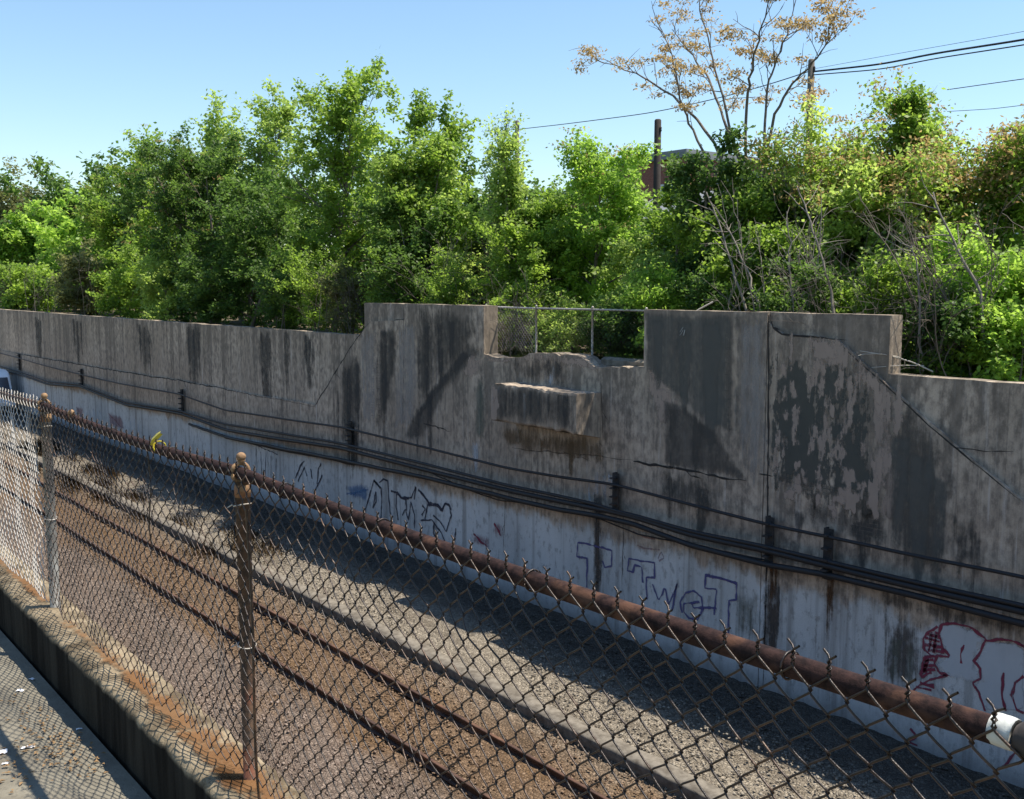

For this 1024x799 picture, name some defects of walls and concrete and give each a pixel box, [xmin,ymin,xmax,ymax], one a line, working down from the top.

damp [186,325,200,382]
damp [260,334,272,397]
damp [304,336,314,387]
damp [416,322,467,453]
crack [515,315,1022,516]
crack [761,567,769,680]